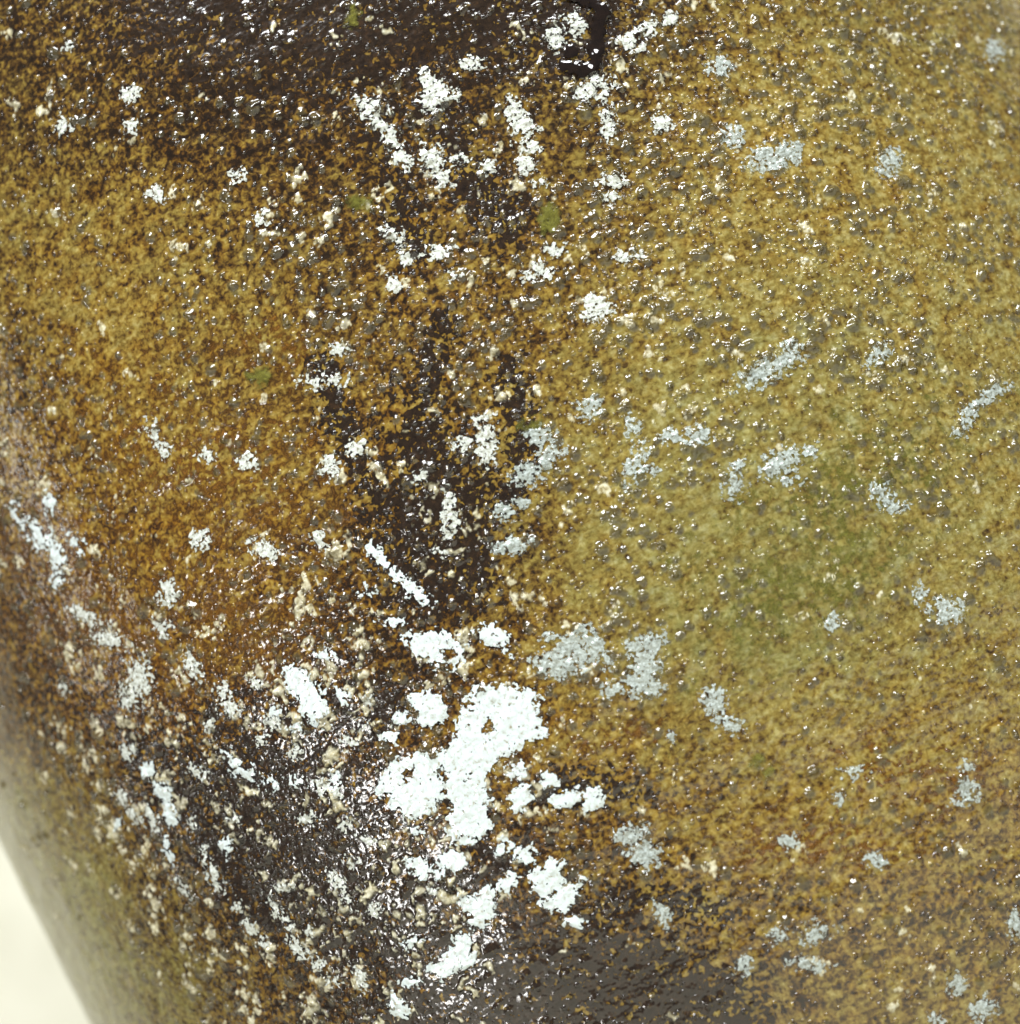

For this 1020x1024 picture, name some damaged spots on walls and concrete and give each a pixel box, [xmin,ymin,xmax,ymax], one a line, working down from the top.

leakage [77,0,690,278]
leakage [301,300,550,657]
leakage [731,432,912,656]
leakage [109,672,787,1024]